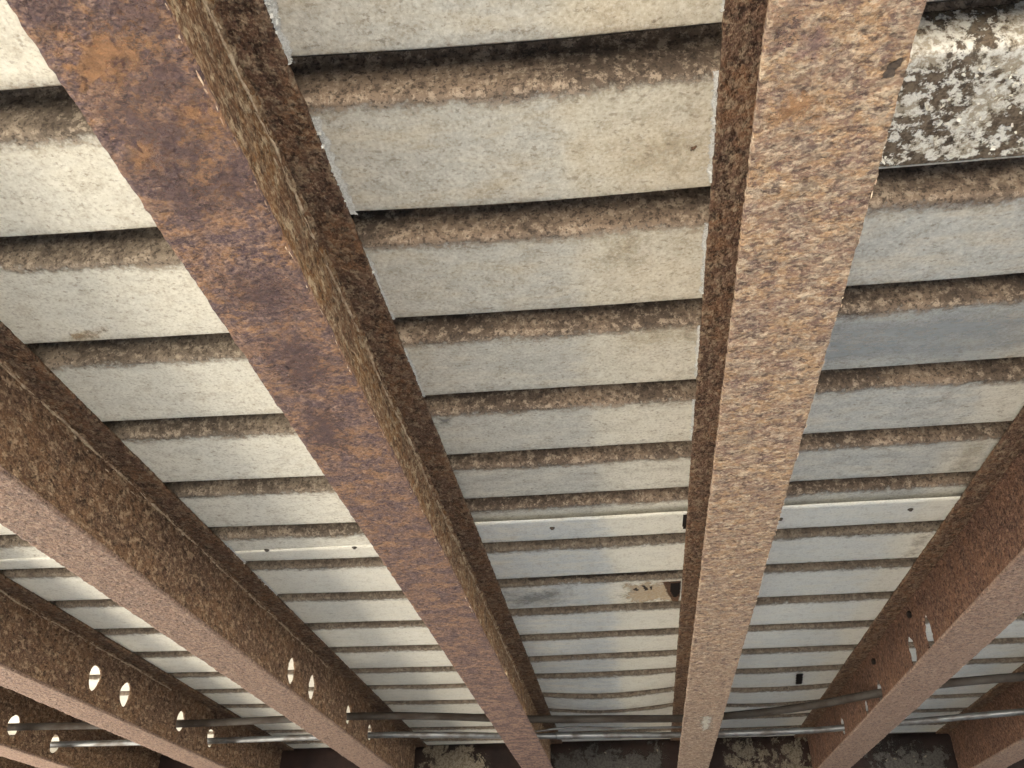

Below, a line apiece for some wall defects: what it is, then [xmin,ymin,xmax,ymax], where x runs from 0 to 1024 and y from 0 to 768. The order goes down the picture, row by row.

corrosion [774,7,805,52]
corrosion [54,0,267,225]
corrosion [209,268,308,320]
corrosion [257,331,352,454]